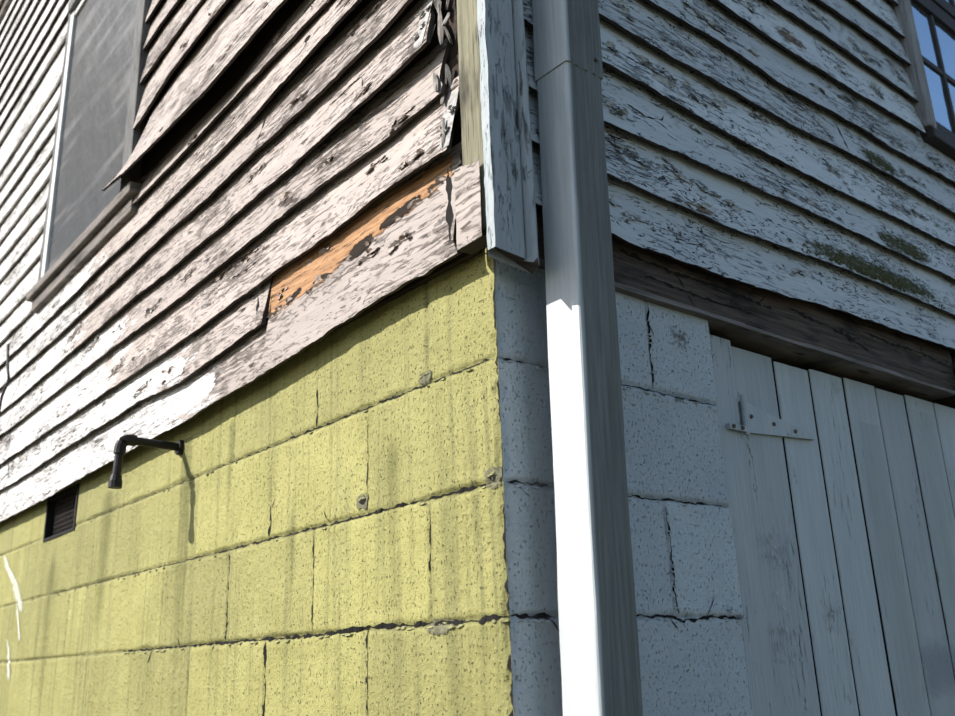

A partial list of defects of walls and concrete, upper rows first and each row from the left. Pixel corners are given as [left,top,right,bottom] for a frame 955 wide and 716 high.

peeling [681,0,731,41]
peeling [776,25,807,52]
peeling [631,51,728,115]
peeling [399,149,423,169]
peeling [663,157,742,216]
peeling [267,155,453,318]
crack [619,249,948,365]
peeling [85,322,126,359]
peeling [133,355,187,398]
peeling [175,372,216,415]
crack [621,308,712,408]
crack [628,495,741,628]